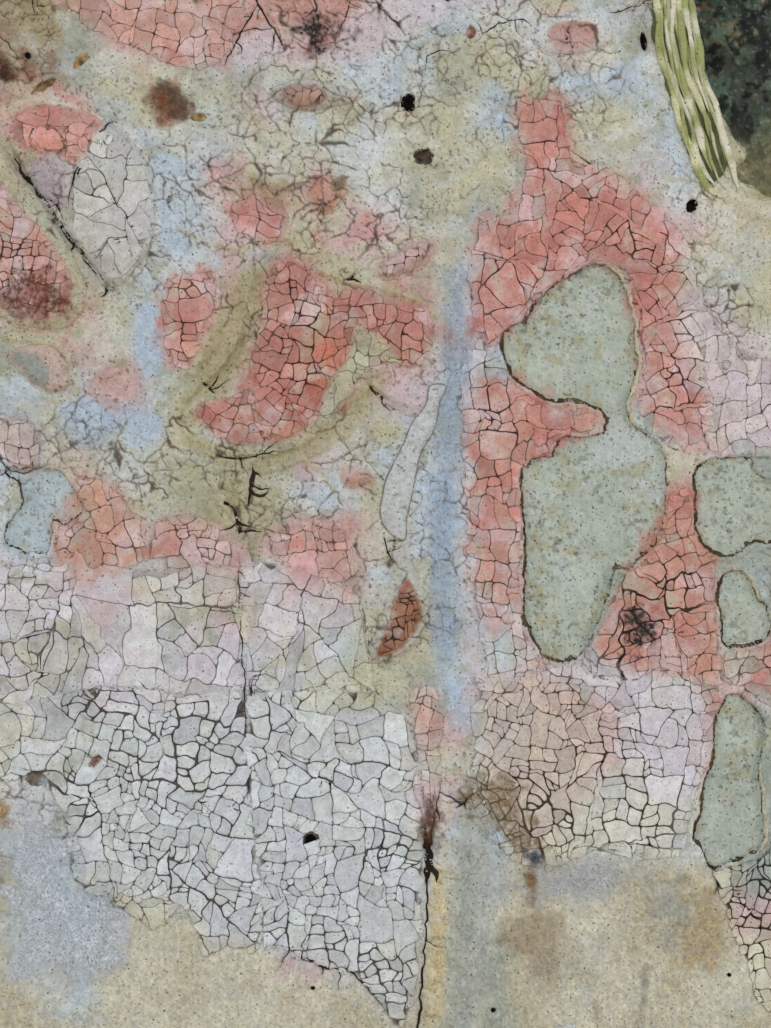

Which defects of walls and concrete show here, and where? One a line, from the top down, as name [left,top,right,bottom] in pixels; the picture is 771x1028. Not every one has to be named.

crack [31,0,284,71]
corrosion [151,81,195,122]
peeling [4,466,83,554]
crack [161,271,217,370]
crack [195,261,434,507]
peeling [499,265,668,663]
crack [439,93,771,873]
peeling [692,457,771,648]
corrosion [0,803,9,828]
crack [0,478,444,1028]
corrosion [420,798,439,842]
peeling [692,694,768,870]